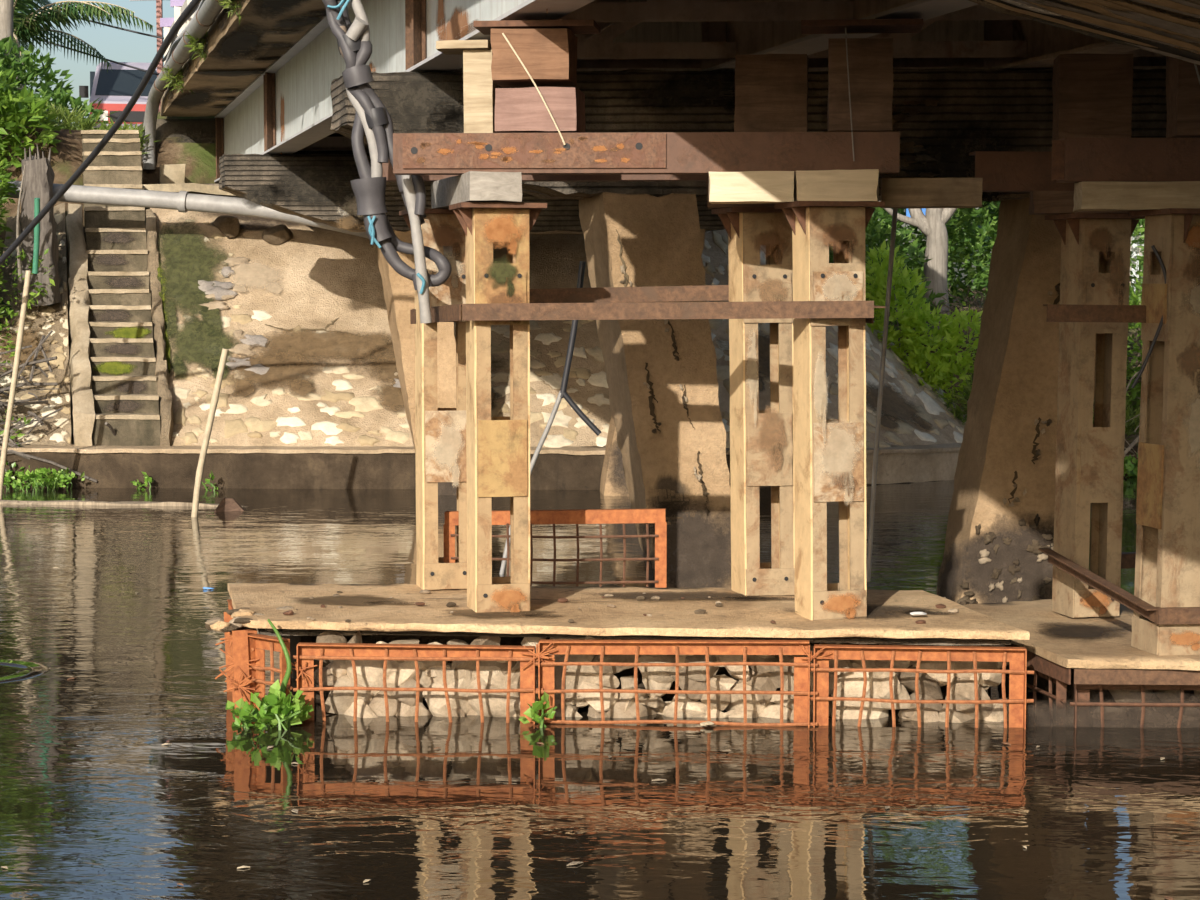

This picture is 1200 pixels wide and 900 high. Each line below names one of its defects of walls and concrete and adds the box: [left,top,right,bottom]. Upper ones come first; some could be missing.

crack [643,319,710,514]
crack [1003,417,1052,507]
water stain [598,477,797,612]
water stain [854,514,1054,618]